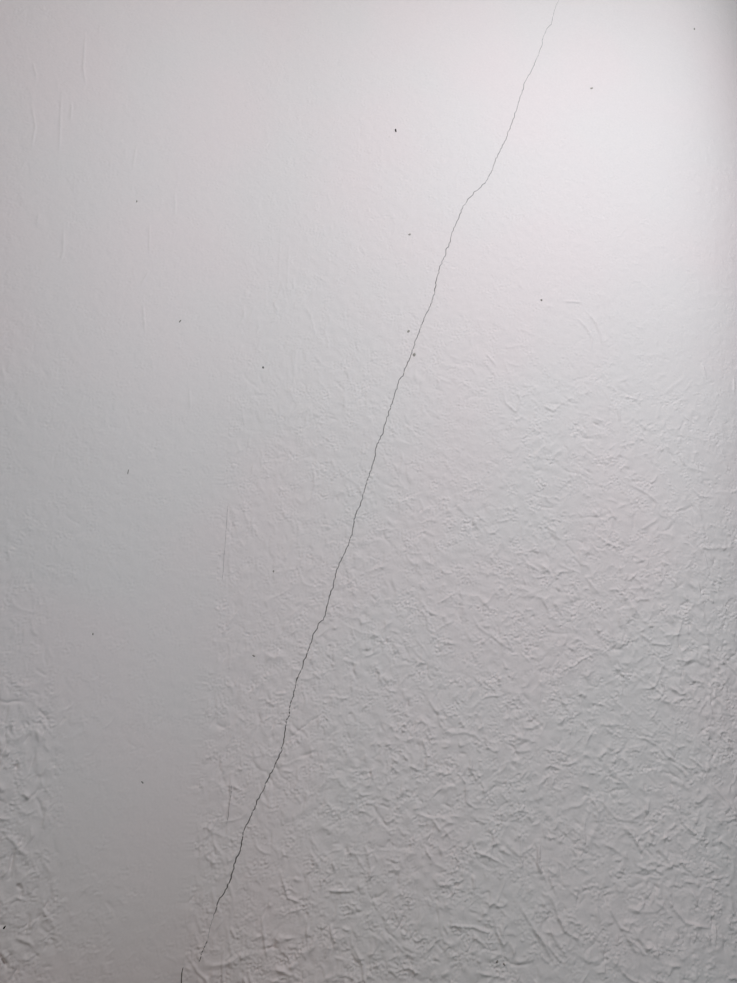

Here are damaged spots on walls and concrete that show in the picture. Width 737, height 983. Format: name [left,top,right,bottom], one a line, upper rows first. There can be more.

crack [181,7,556,983]